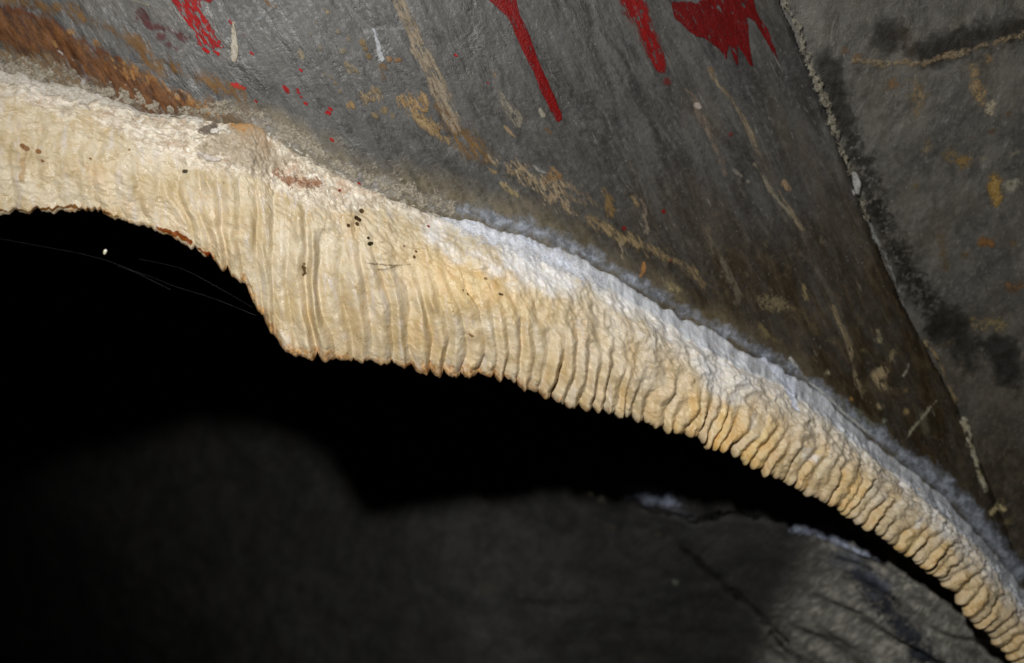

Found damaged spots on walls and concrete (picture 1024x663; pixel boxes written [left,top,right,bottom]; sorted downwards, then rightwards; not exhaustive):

damp [0,55,177,119]
corrosion [0,0,251,124]
damp [175,100,243,125]
damp [359,0,490,163]
damp [440,200,608,291]
damp [586,215,705,289]
crack [708,67,862,394]
damp [816,49,1021,389]
damp [756,349,800,411]
damp [960,417,988,491]
damp [957,494,1024,581]
damp [789,520,938,663]